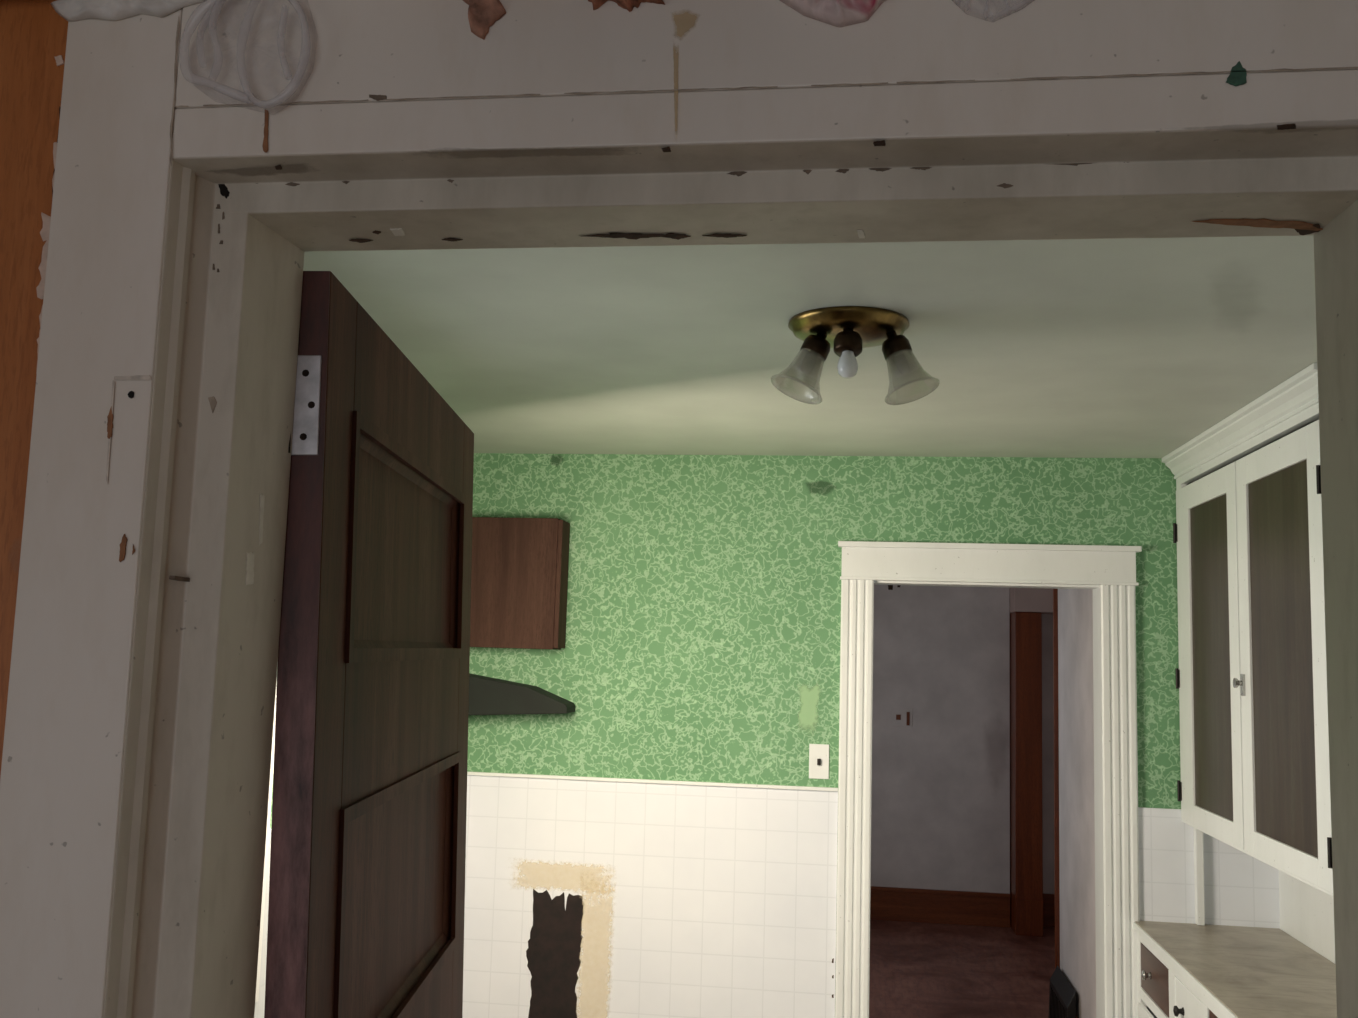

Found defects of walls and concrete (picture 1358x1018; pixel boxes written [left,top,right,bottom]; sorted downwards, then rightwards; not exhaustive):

peeling [526,889,584,1018]